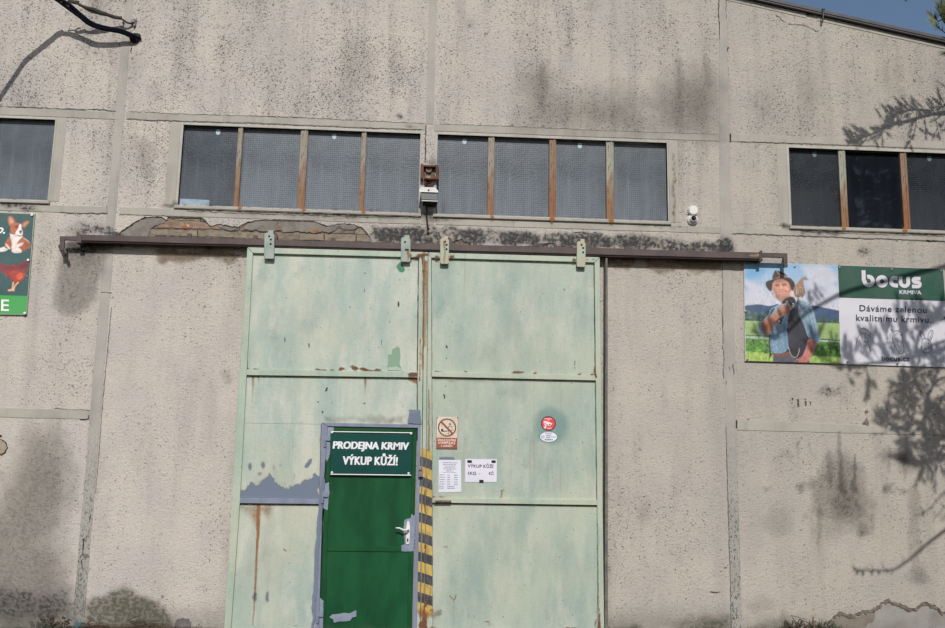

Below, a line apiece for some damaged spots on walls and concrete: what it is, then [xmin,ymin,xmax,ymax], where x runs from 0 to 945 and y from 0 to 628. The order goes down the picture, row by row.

flaking render [120,216,372,242]
damp [371,213,734,252]
corrosion [407,250,454,362]
peeling [316,346,401,371]
damp [84,589,171,628]
corrosion [419,598,442,628]
flaking render [826,599,945,628]